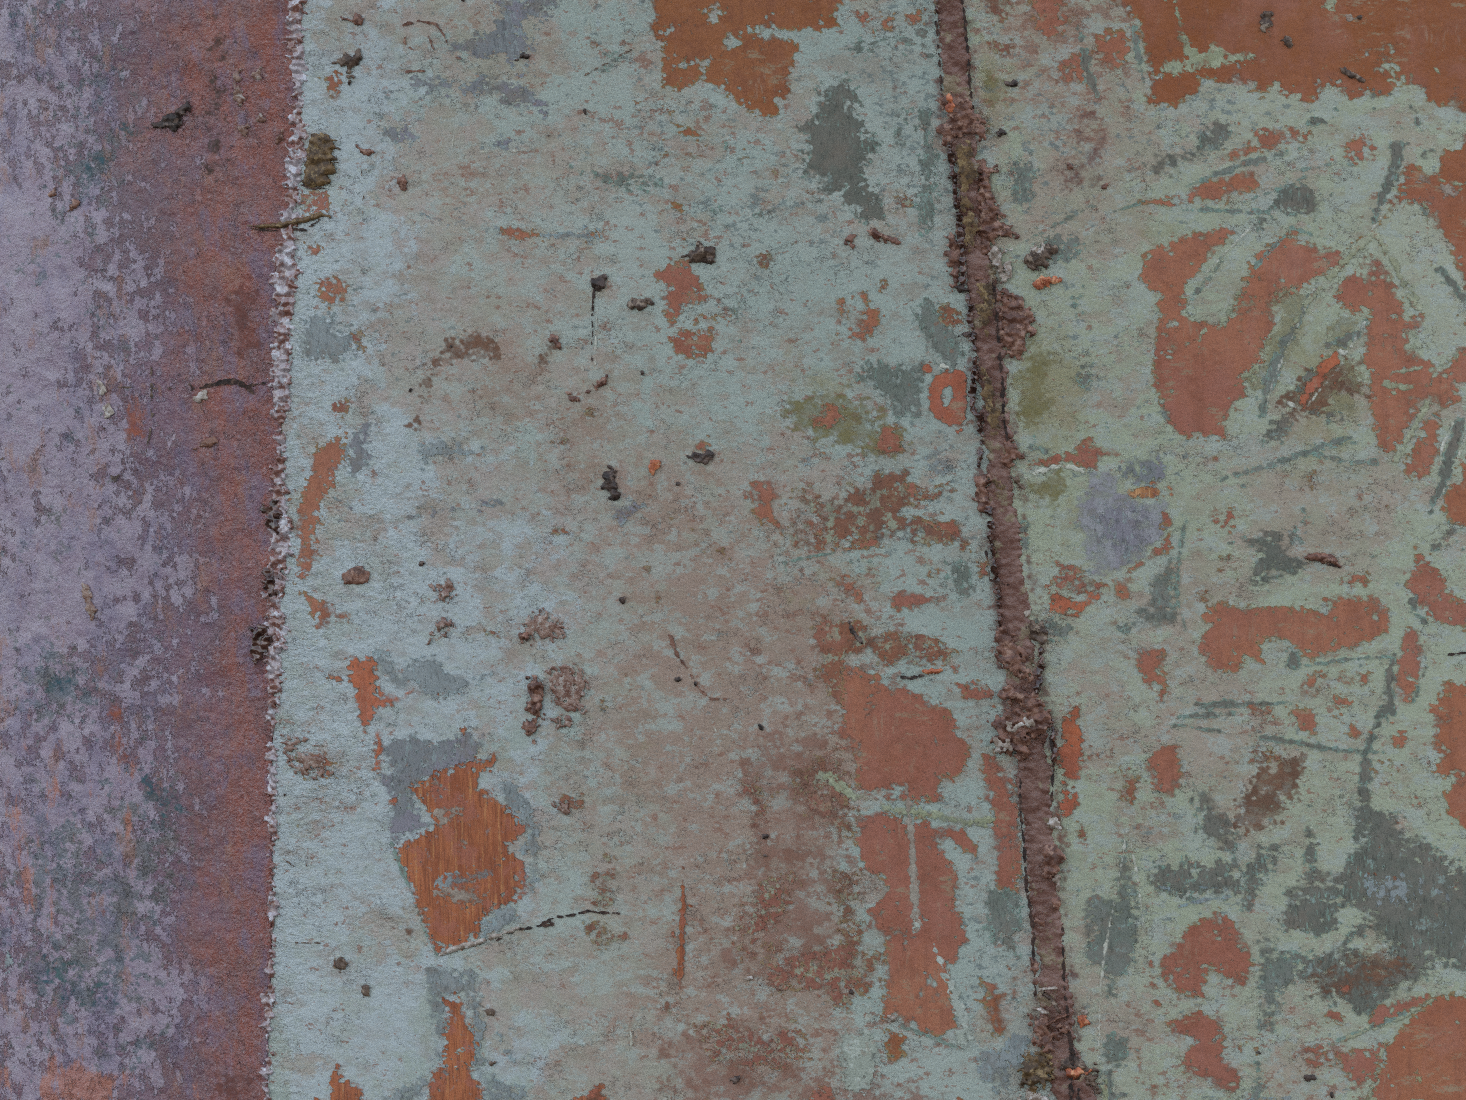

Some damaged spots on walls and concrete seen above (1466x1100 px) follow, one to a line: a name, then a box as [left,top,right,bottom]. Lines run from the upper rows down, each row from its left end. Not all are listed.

peeling [547,332,562,350]
peeling [565,0,1466,1100]
peeling [326,649,544,893]
peeling [554,792,588,815]
peeling [381,891,528,1100]